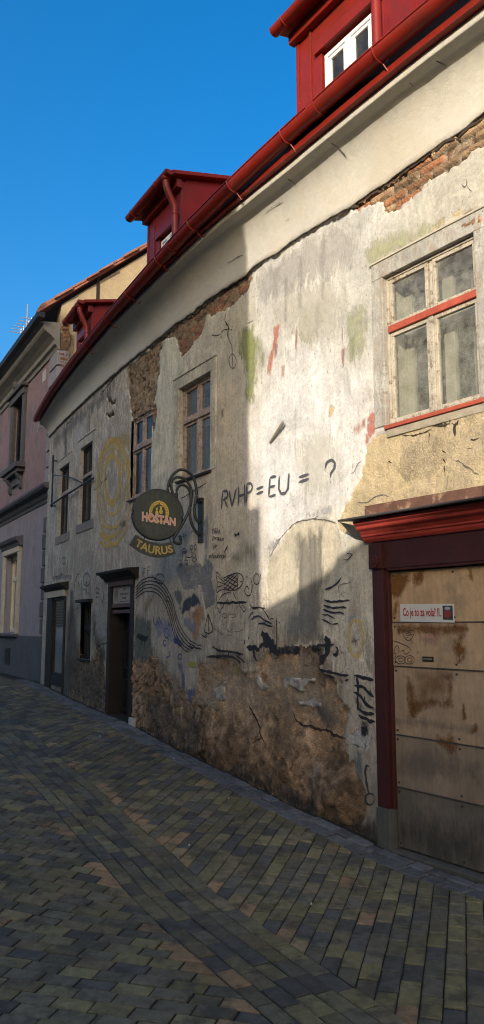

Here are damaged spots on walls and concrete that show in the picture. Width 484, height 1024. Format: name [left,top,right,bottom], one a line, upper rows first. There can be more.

spalling [352,114,484,213]
flaking render [128,269,253,431]
flaking render [131,403,484,835]
crack [249,706,346,743]